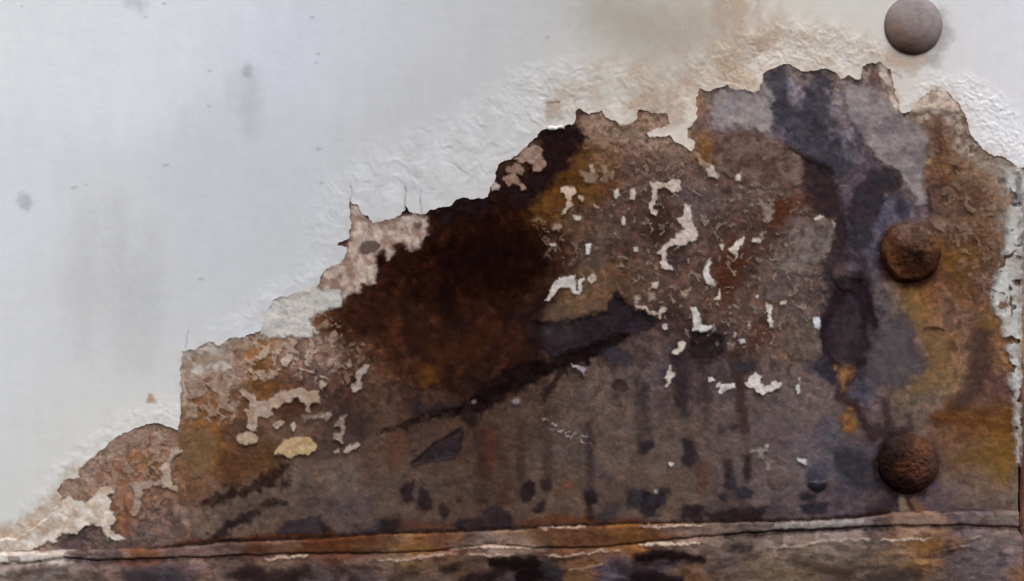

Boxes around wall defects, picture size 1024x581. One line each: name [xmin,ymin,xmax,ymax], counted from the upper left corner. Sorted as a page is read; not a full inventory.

peeling [514,130,547,171]
corrosion [336,101,589,388]
peeling [657,204,698,270]
damp [765,65,914,440]
peeling [547,275,585,301]
spalling [537,290,656,359]
damp [673,347,687,413]
damp [719,348,756,432]
peeling [745,372,782,395]
peeling [274,437,317,458]
peeling [0,461,124,552]
damp [10,420,926,581]